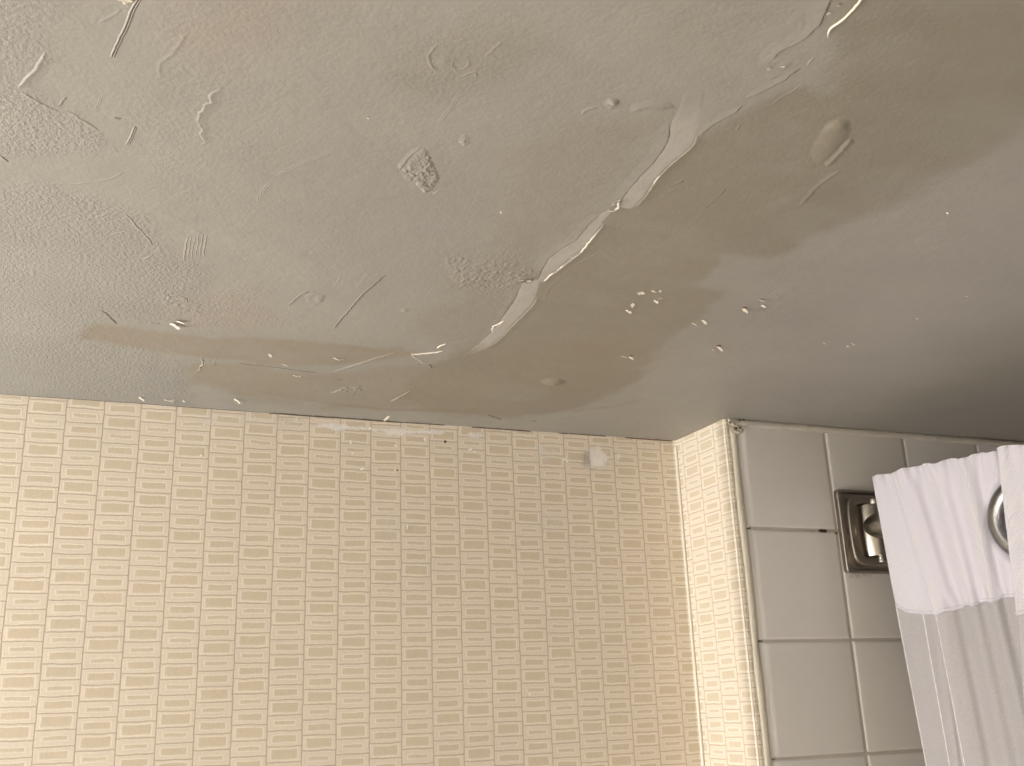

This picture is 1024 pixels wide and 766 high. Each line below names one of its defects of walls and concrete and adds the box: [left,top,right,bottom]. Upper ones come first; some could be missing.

spalling [98,0,142,59]
spalling [397,146,441,194]
water stain [74,0,1024,422]
peeling [463,91,710,357]
crack [289,276,384,329]